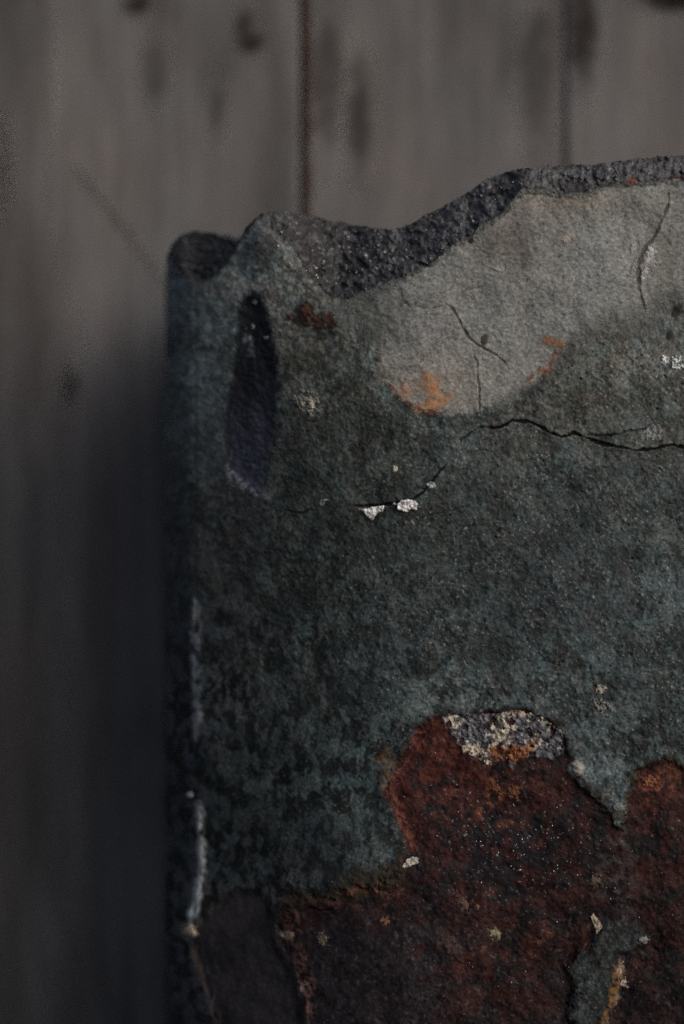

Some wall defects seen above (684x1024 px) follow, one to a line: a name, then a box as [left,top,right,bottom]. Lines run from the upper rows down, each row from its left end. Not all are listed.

corrosion [286,300,336,328]
corrosion [376,355,450,415]
crack [168,155,684,307]
spalling [348,182,684,417]
crack [448,305,684,451]
crack [288,499,329,513]
crack [354,466,445,520]
corrosion [274,707,684,1024]